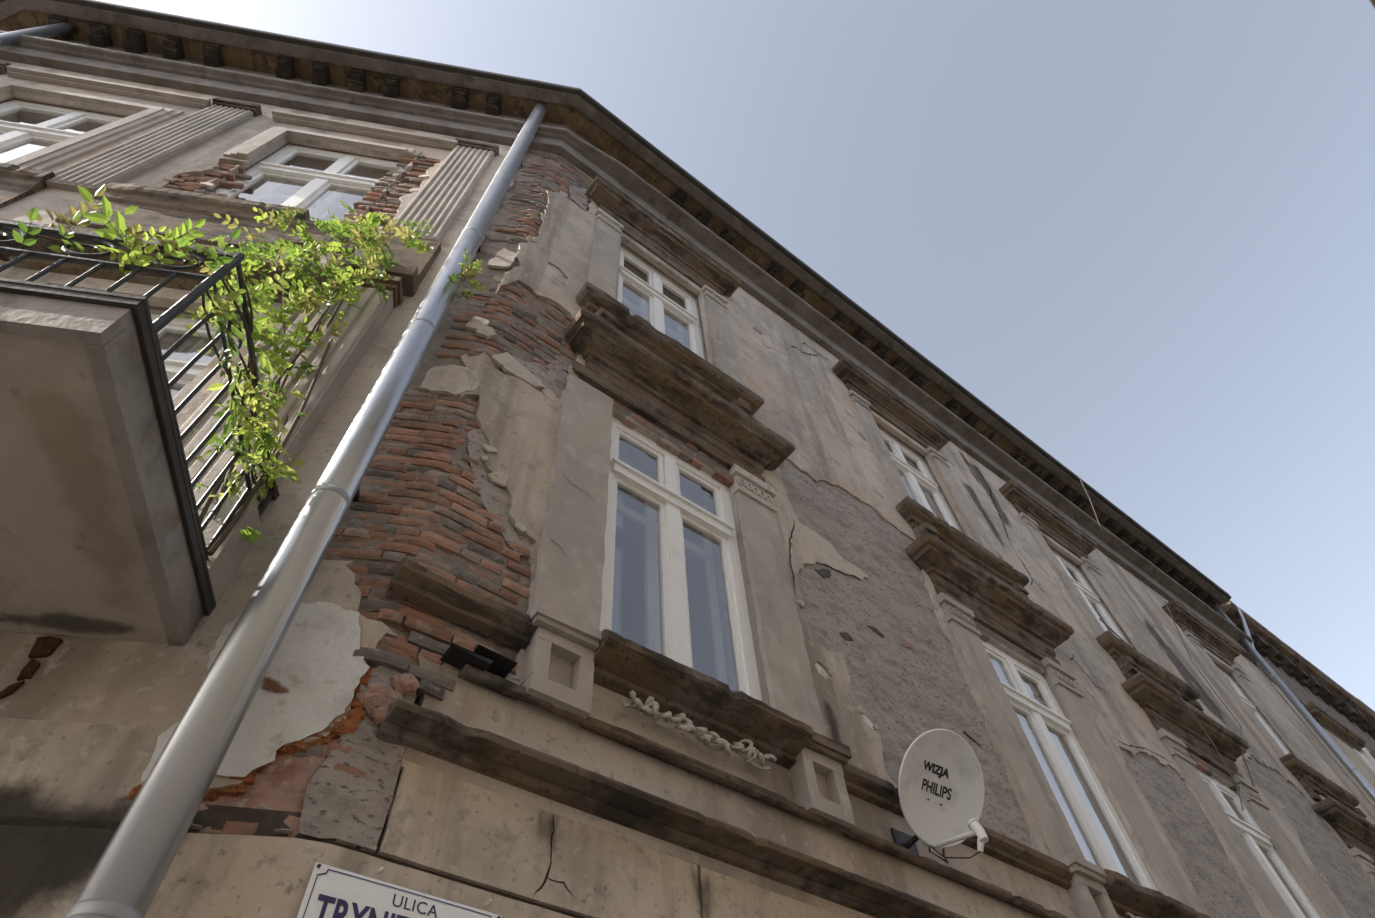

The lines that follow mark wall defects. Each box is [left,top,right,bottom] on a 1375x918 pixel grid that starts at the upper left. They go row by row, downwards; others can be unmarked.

spalling [163,160,252,197]
spalling [198,152,591,847]
spalling [779,459,1031,848]
spalling [125,784,142,800]
crack [533,814,574,897]
spalling [1120,749,1375,918]